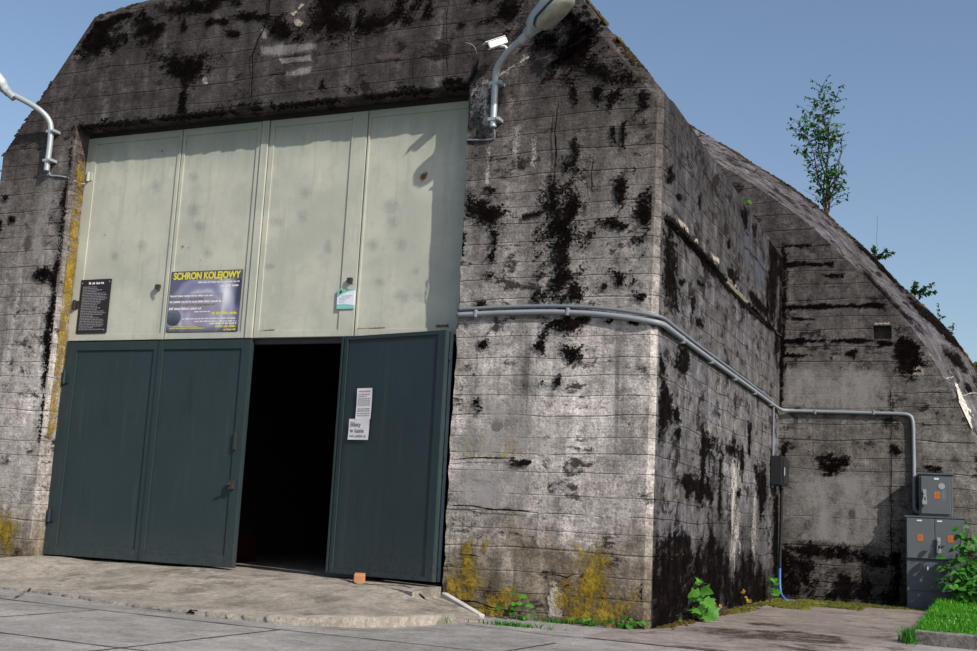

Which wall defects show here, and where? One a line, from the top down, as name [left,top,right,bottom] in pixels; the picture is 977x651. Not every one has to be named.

water stain [262,28,284,63]
crack [451,454,516,462]
crack [451,504,530,512]